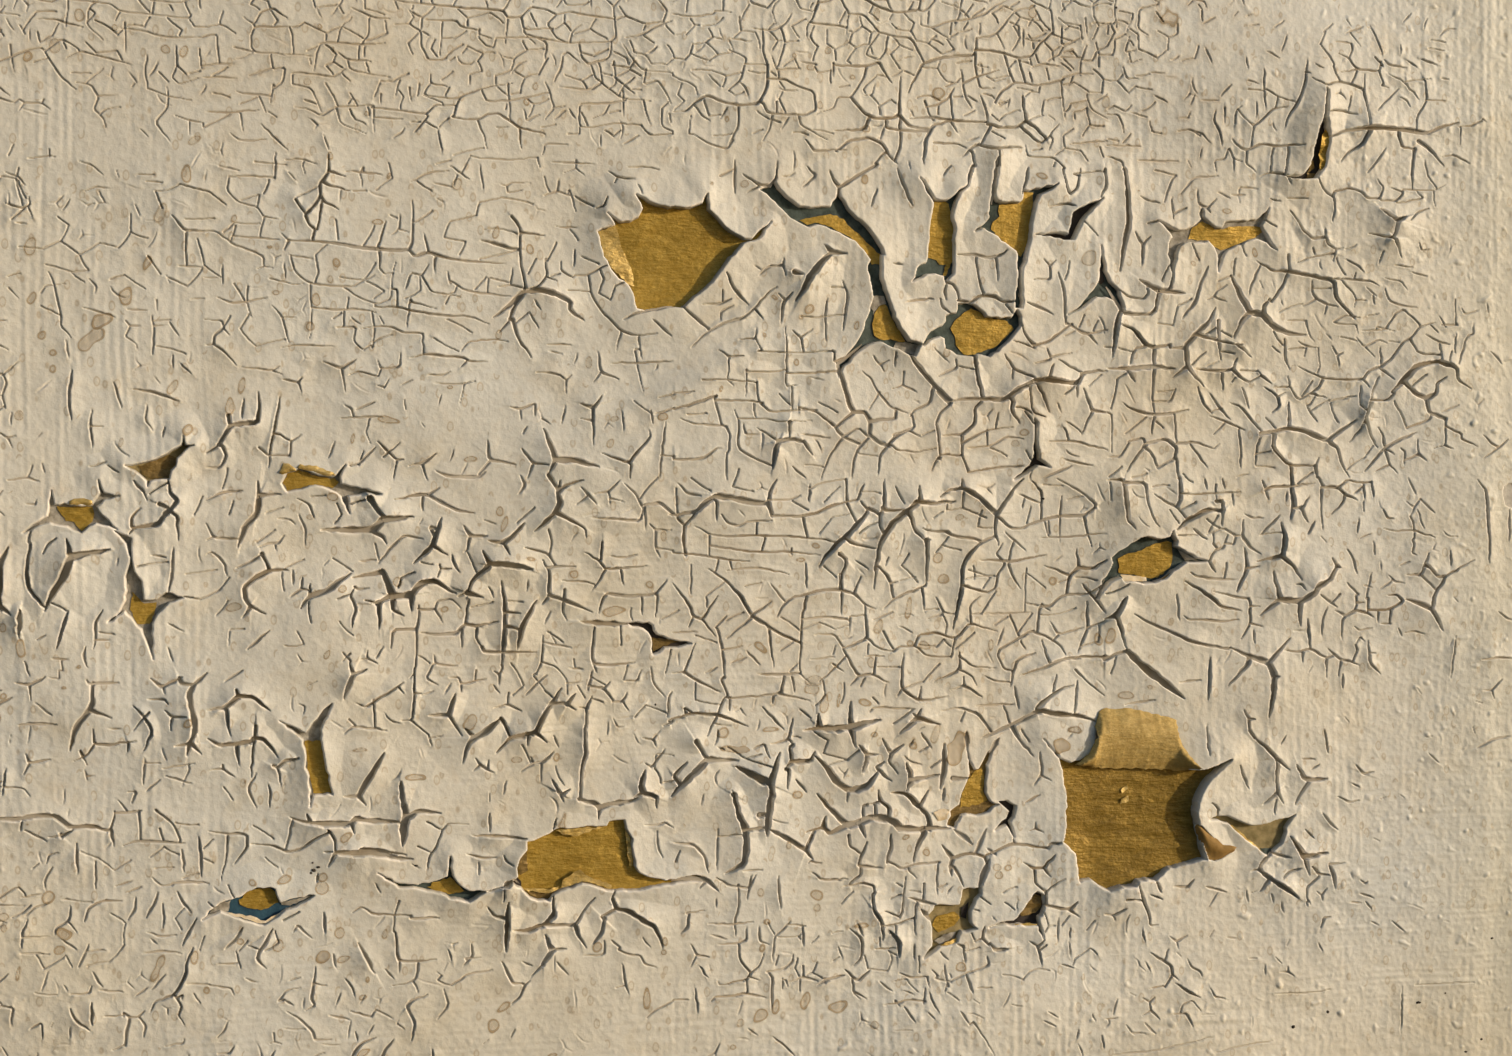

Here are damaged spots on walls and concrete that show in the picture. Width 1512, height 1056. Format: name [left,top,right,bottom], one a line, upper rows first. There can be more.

crack [0,320,41,446]
crack [40,163,191,471]
crack [0,0,1308,410]
peeling [587,149,1137,389]
peeling [1147,76,1342,291]
peeling [11,421,210,672]
crack [130,483,239,585]
crack [184,198,1507,1056]
peeling [1084,519,1219,610]
crack [0,532,457,1050]
peeling [365,808,717,917]
peeling [911,708,1307,972]